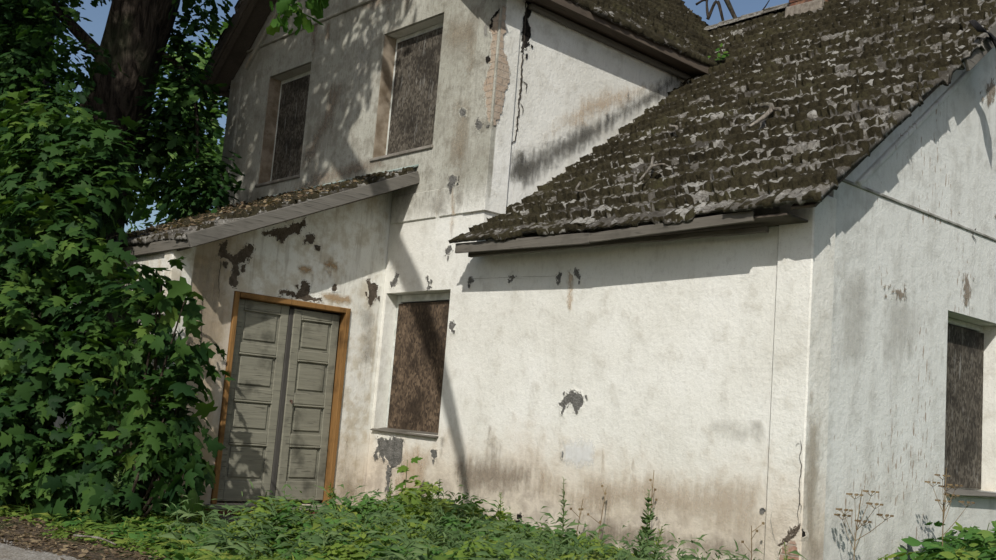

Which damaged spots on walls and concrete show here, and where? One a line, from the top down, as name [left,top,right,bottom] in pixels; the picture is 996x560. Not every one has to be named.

flaking render [519,0,533,58]
flaking render [456,3,511,135]
crack [511,1,528,145]
flaking render [214,215,321,294]
flaking render [274,276,340,304]
flaking render [363,269,401,308]
flaking render [552,263,585,289]
flaking render [556,384,589,419]
flaking render [372,432,407,498]
damp [458,462,522,485]
crack [795,441,803,526]
flaking render [773,516,810,560]